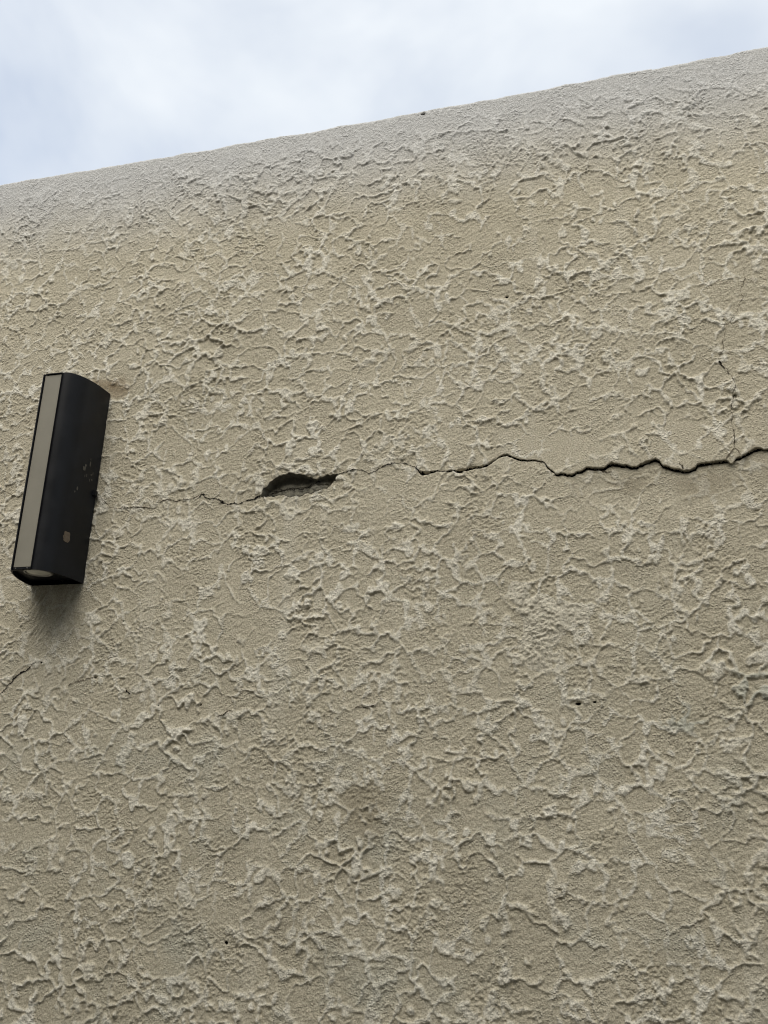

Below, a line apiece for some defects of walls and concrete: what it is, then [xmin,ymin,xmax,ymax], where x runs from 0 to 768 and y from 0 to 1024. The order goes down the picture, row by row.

crack [339,260,768,477]
spalling [261,472,338,497]